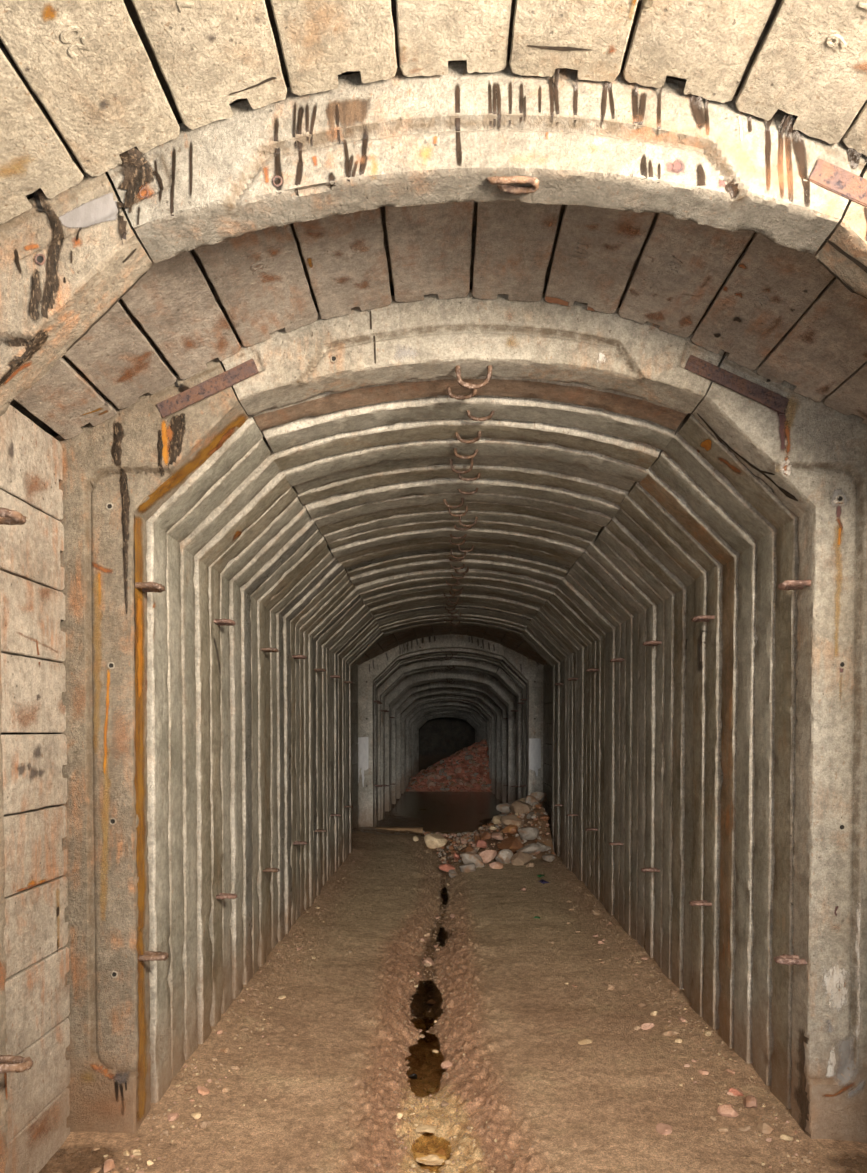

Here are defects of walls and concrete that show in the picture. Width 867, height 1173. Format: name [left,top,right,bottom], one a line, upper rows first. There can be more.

water stain [264,99,369,196]
water stain [601,81,615,125]
water stain [632,85,663,134]
water stain [690,94,709,135]
water stain [739,113,810,207]
water stain [14,197,82,320]
corrosion [767,393,796,454]
corrosion [832,490,848,654]
corrosion [93,563,112,911]
corrosion [134,413,246,1121]